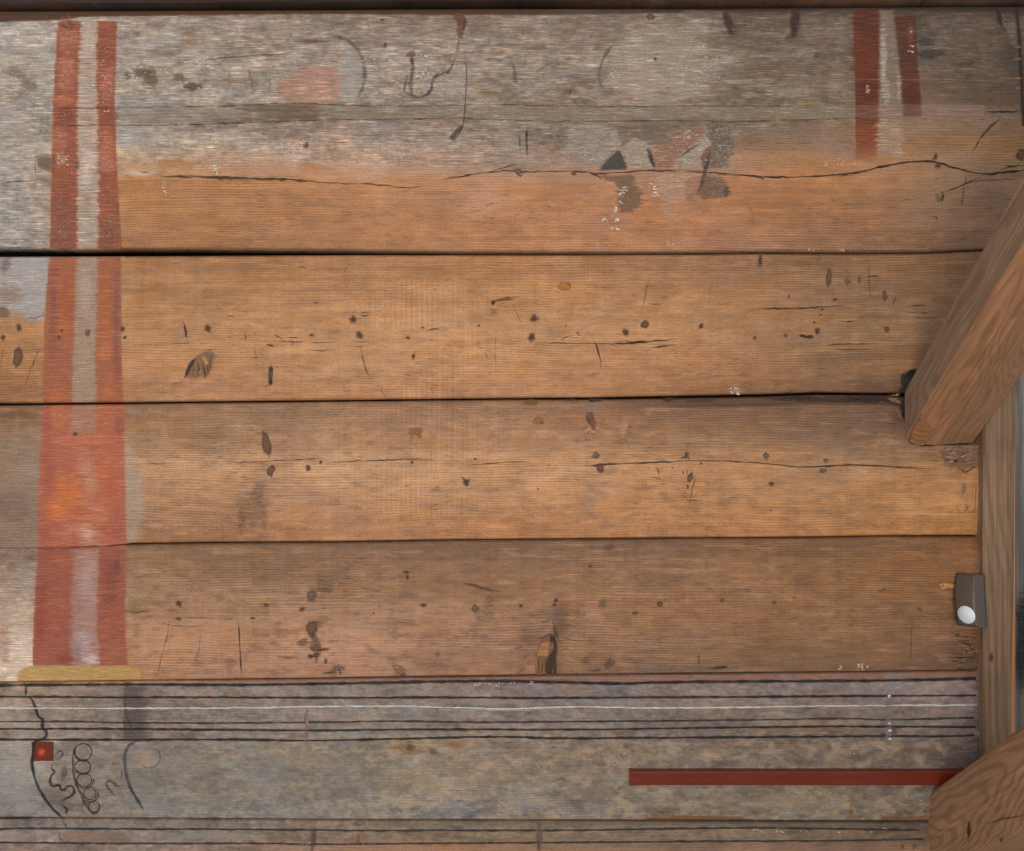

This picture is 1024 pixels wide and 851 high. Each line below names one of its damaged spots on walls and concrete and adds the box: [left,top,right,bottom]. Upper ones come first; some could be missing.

crack [143,160,1024,192]